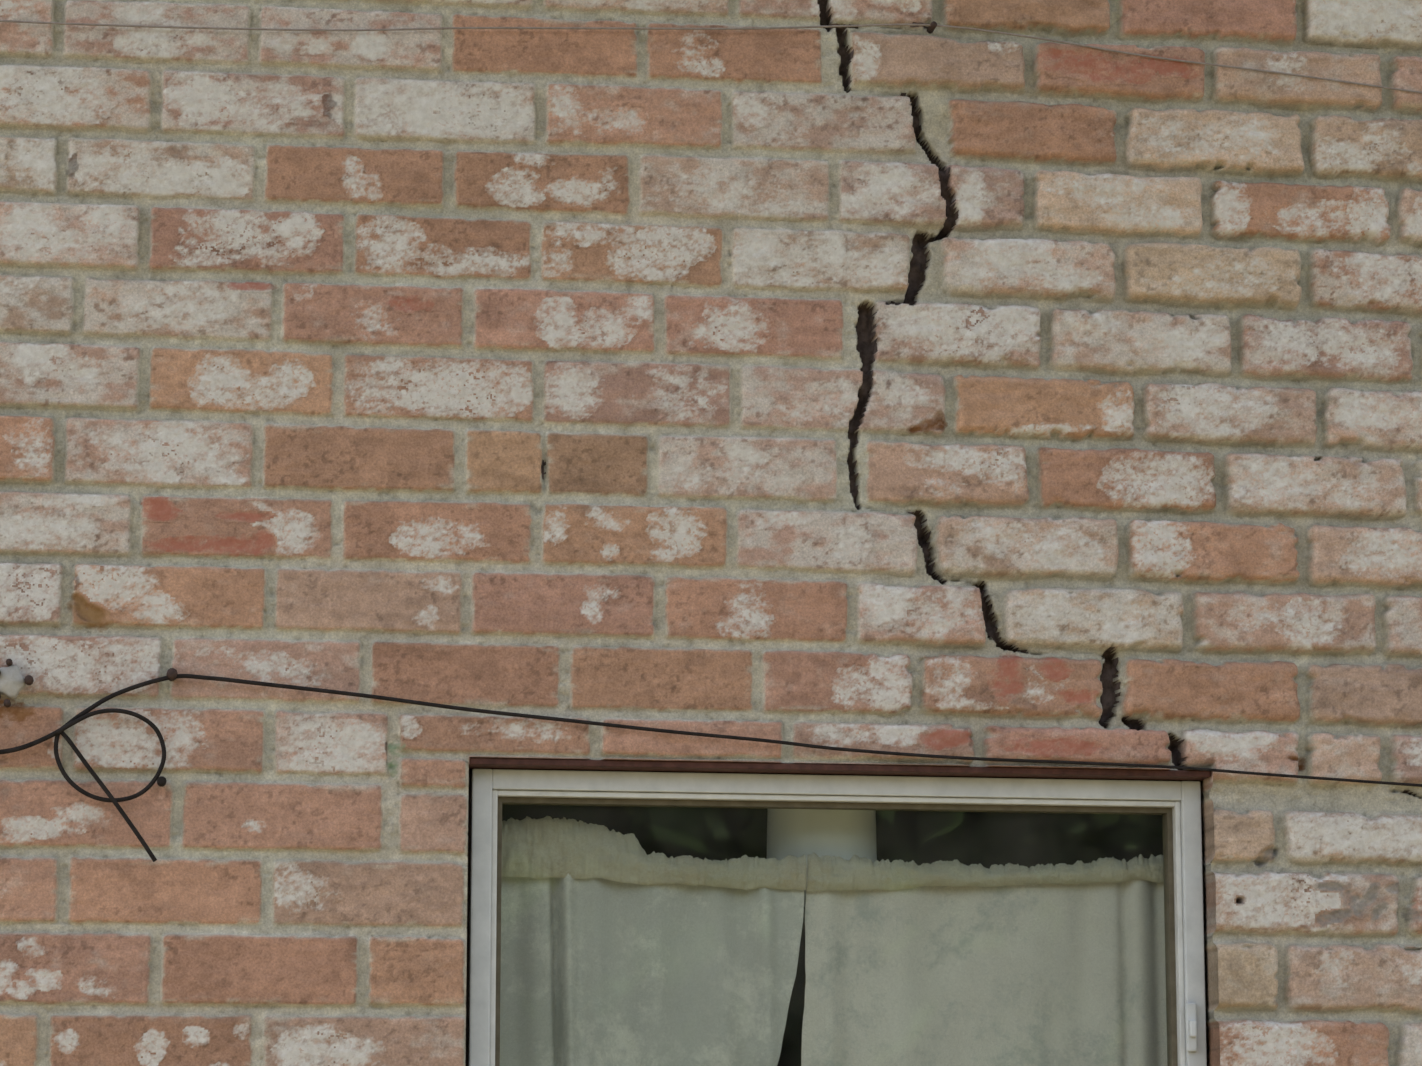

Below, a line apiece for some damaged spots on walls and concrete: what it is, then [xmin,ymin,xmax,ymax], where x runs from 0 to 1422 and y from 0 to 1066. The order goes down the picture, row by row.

crack [817,0,858,93]
crack [847,93,959,510]
crack [908,510,1028,653]
crack [1099,647,1187,770]